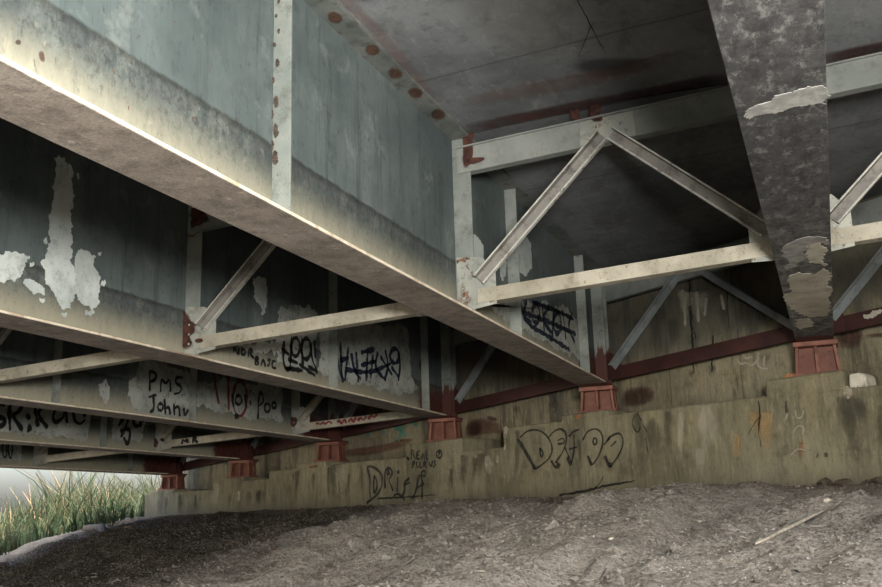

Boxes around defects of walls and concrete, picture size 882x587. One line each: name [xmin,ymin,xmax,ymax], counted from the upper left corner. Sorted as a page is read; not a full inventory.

crack [577,0,606,57]
rust [483,81,707,129]
peeling [744,85,831,119]
rust [463,133,484,167]
peeling [0,155,106,317]
rust [191,208,209,228]
peeling [781,236,833,330]